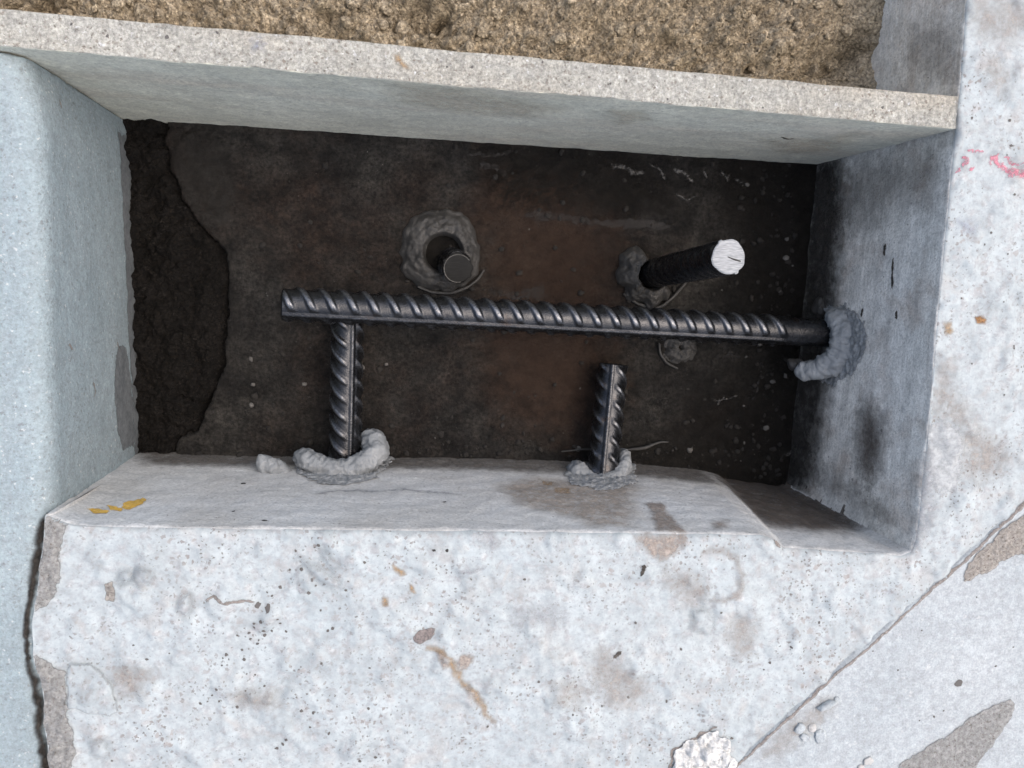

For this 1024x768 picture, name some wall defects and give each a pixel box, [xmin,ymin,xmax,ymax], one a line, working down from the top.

peeling [115,345,135,450]
leakage [859,411,880,474]
spalling [964,516,1024,581]
crack [736,502,1024,768]
rust [431,648,486,708]
spalling [899,699,1015,768]